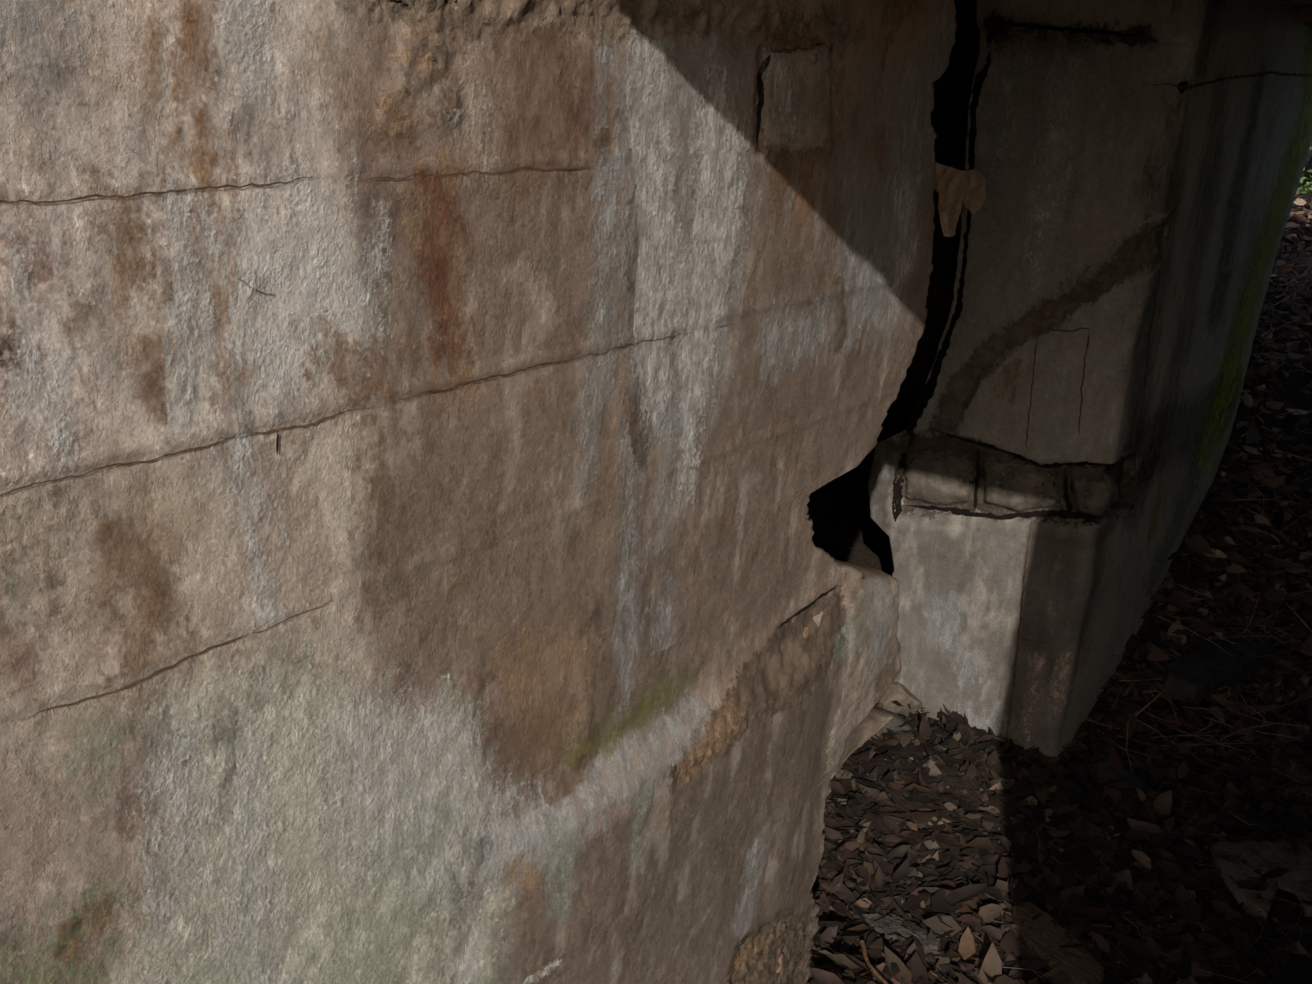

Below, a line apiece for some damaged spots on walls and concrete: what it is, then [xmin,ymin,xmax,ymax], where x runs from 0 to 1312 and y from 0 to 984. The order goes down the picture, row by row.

damp [0,181,95,484]
crack [0,177,320,204]
damp [163,148,393,629]
crack [0,323,732,496]
crack [362,165,599,181]
damp [457,25,796,723]
damp [757,0,954,380]
crack [892,209,971,522]
crack [968,19,996,169]
damp [129,639,710,984]
spalling [664,576,902,795]
damp [922,592,1000,736]